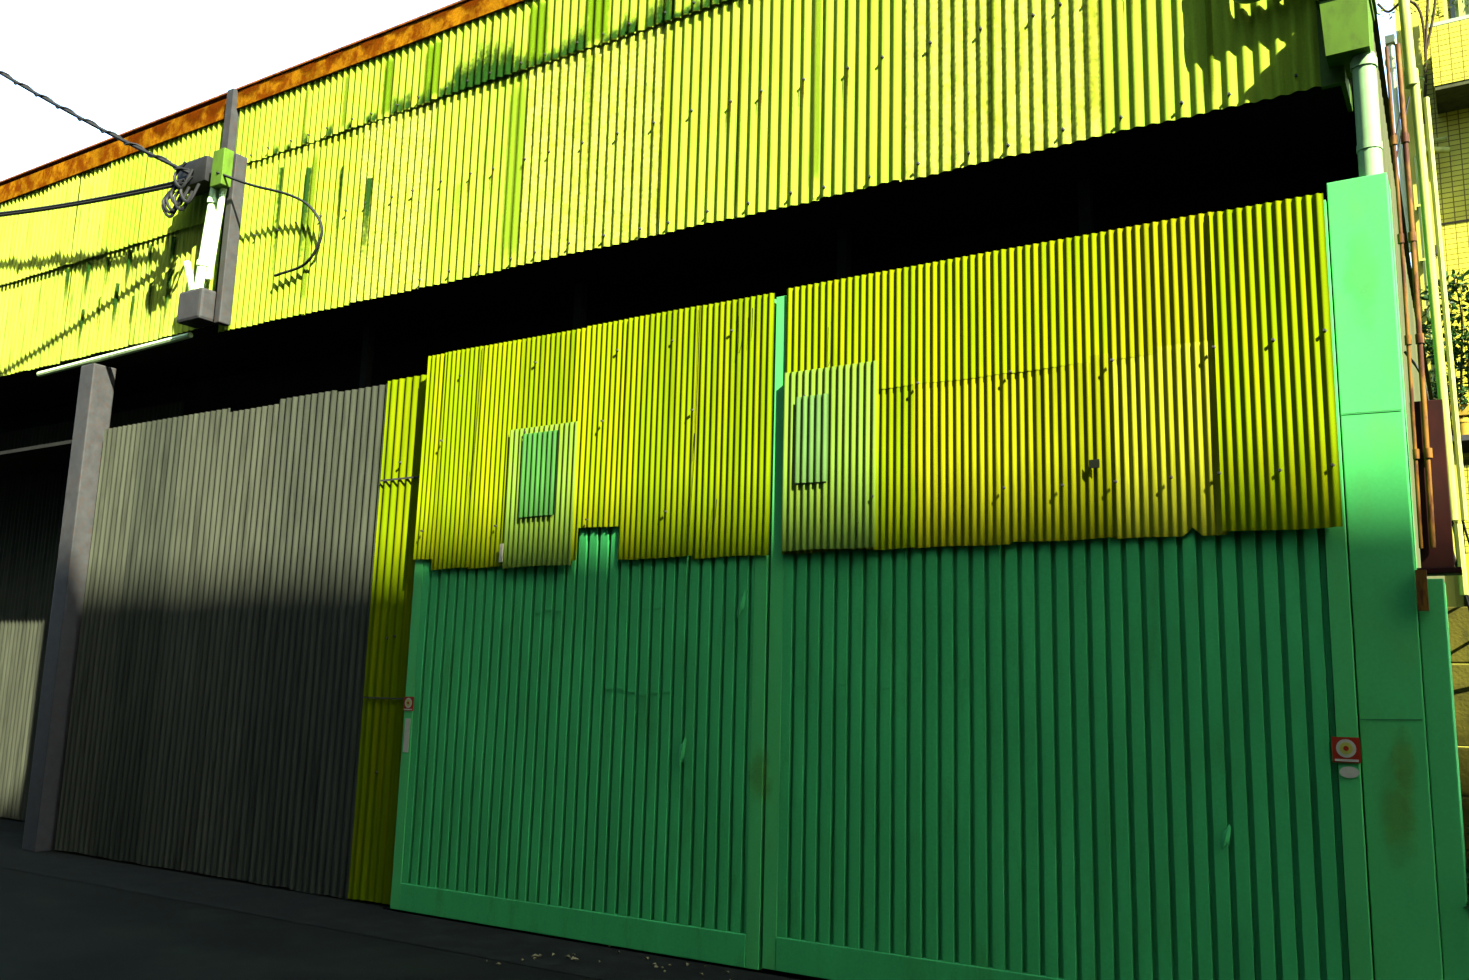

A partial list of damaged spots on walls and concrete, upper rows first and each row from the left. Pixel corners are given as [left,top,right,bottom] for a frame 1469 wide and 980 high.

rust [241,50,343,96]
rust [361,23,411,48]
rust [430,0,479,19]
damp [326,0,728,135]
rust [128,101,224,143]
damp [585,64,595,228]
damp [273,90,318,296]
damp [335,165,344,251]
damp [363,178,372,244]